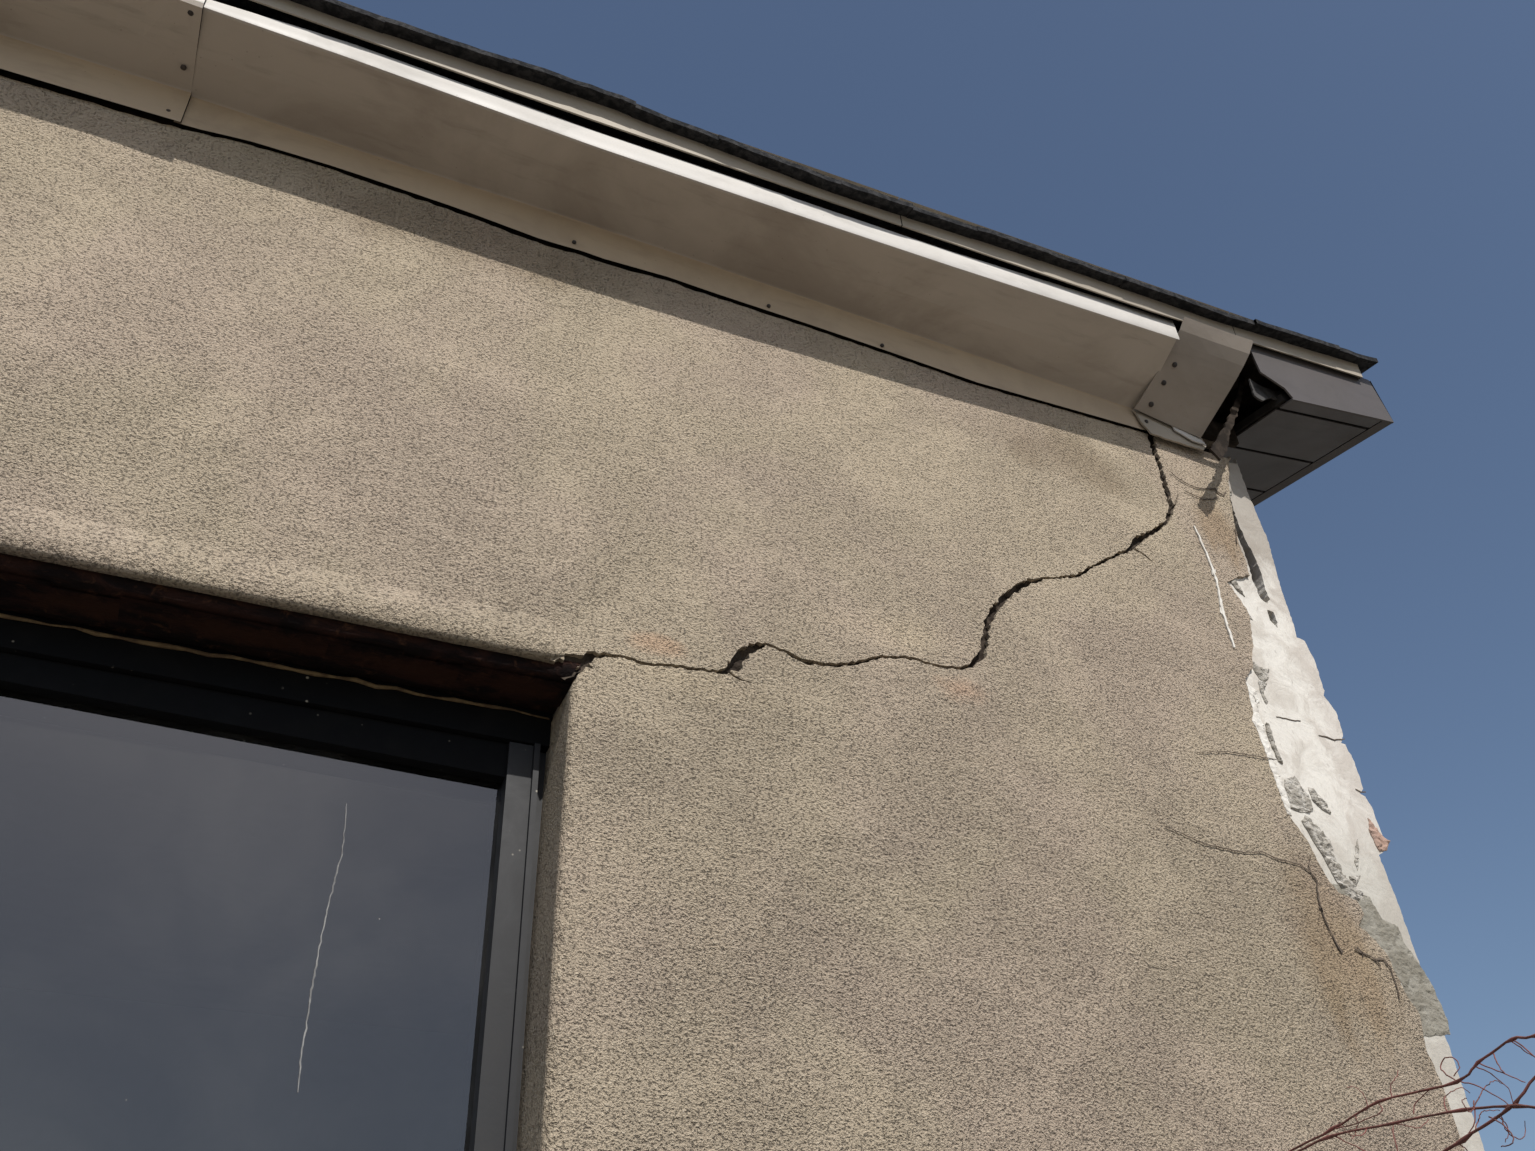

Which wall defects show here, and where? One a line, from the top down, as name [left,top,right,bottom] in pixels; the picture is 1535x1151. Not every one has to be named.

crack [555,654,657,680]
crack [709,644,913,674]
crack [948,430,1238,670]
spalling [1193,458,1484,1151]